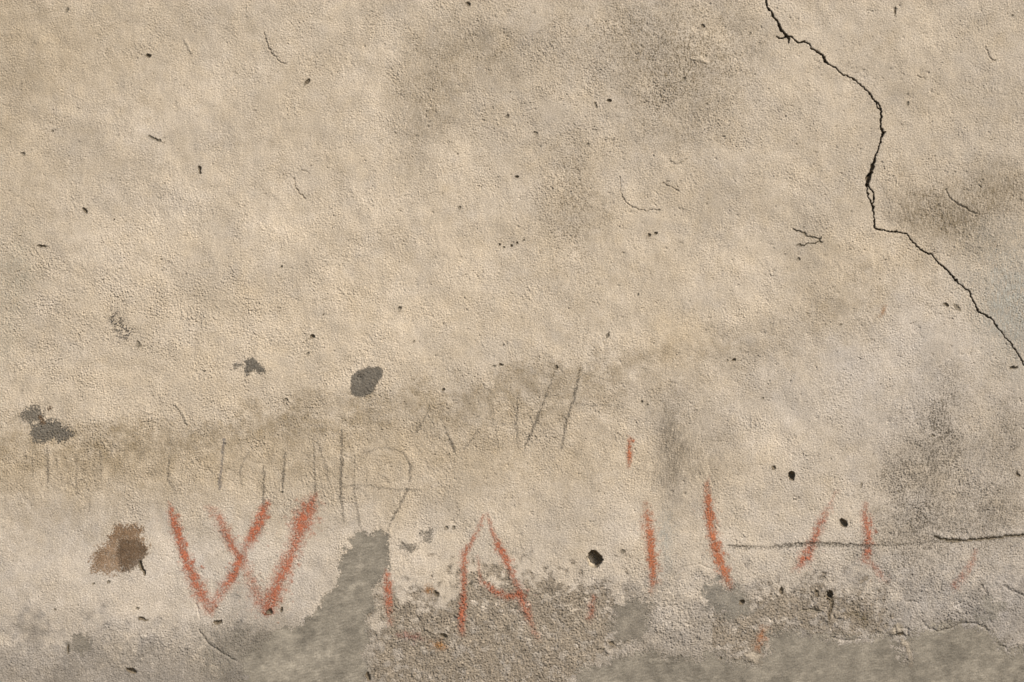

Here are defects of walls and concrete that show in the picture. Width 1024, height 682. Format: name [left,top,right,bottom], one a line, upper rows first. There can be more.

crack [765,0,1024,366]
leakage [234,357,265,376]
leakage [351,366,383,396]
leakage [21,405,75,444]
crack [729,541,884,549]
crack [934,533,1024,543]
spalling [208,529,1024,682]